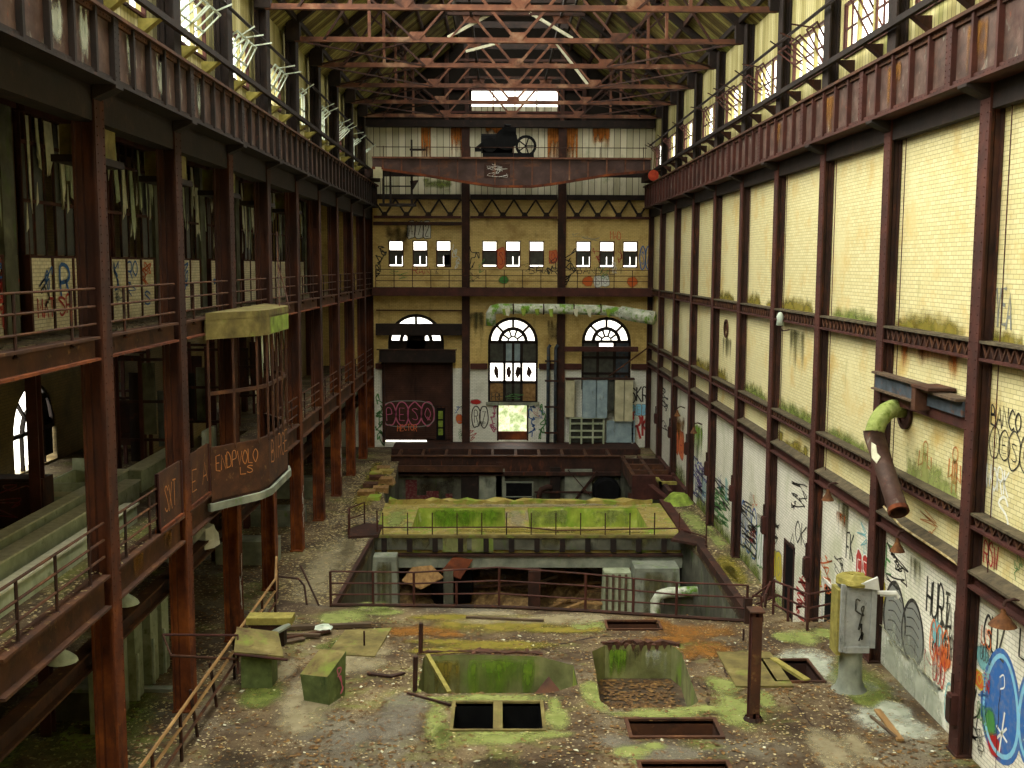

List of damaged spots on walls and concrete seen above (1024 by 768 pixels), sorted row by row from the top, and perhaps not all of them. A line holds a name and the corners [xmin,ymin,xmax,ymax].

rust [421,128,431,155]
rust [547,128,578,157]
rust [593,129,610,142]